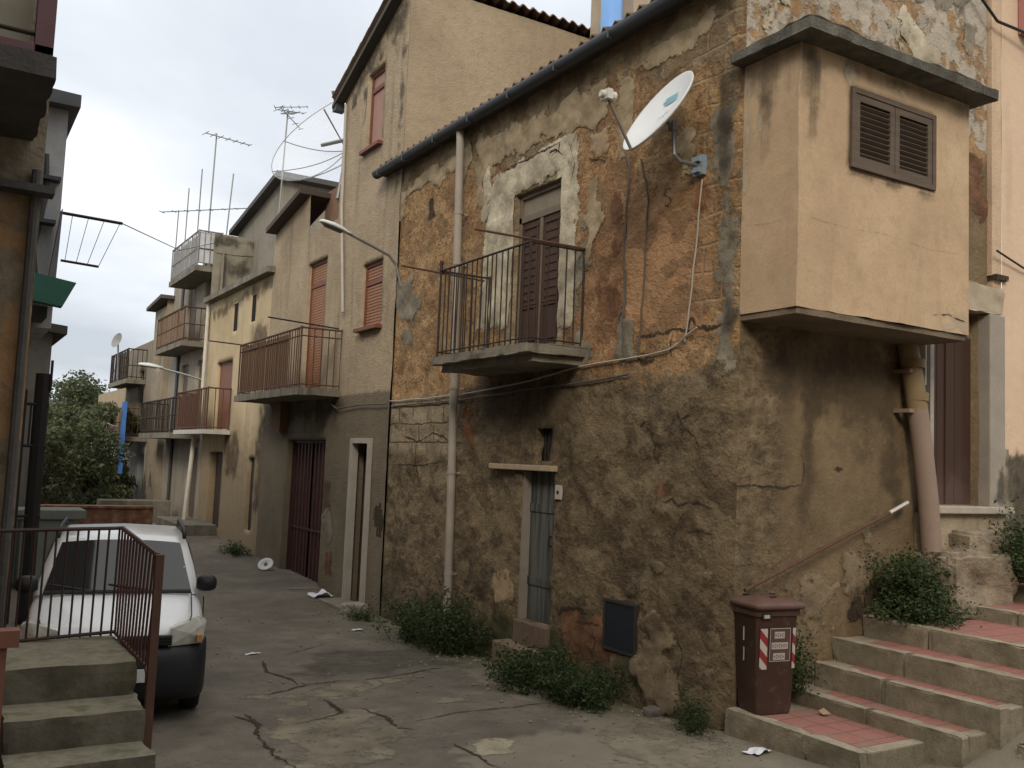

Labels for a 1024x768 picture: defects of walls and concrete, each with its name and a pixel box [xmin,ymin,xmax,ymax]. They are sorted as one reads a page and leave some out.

peeling [759,0,800,34]
peeling [881,0,969,65]
peeling [396,5,717,367]
water stain [706,75,762,373]
crack [396,432,447,478]
crack [732,463,805,489]
crack [262,660,298,685]